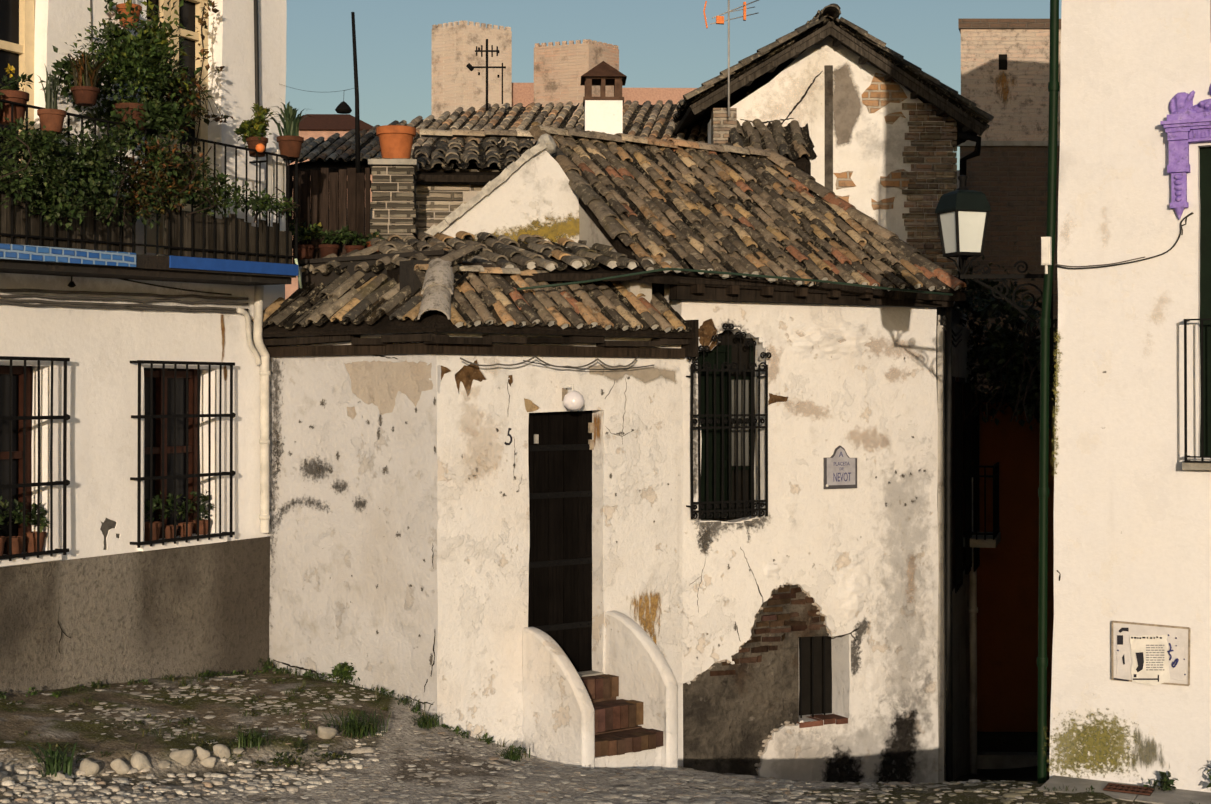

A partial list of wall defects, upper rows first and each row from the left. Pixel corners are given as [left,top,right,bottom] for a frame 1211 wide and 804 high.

peeling [833,63,929,145]
peeling [833,171,856,203]
peeling [871,169,918,210]
flaking render [699,319,720,350]
peeling [344,360,487,440]
crack [605,376,636,445]
damp [300,457,347,492]
flaking render [683,582,834,776]
damp [1128,729,1164,768]